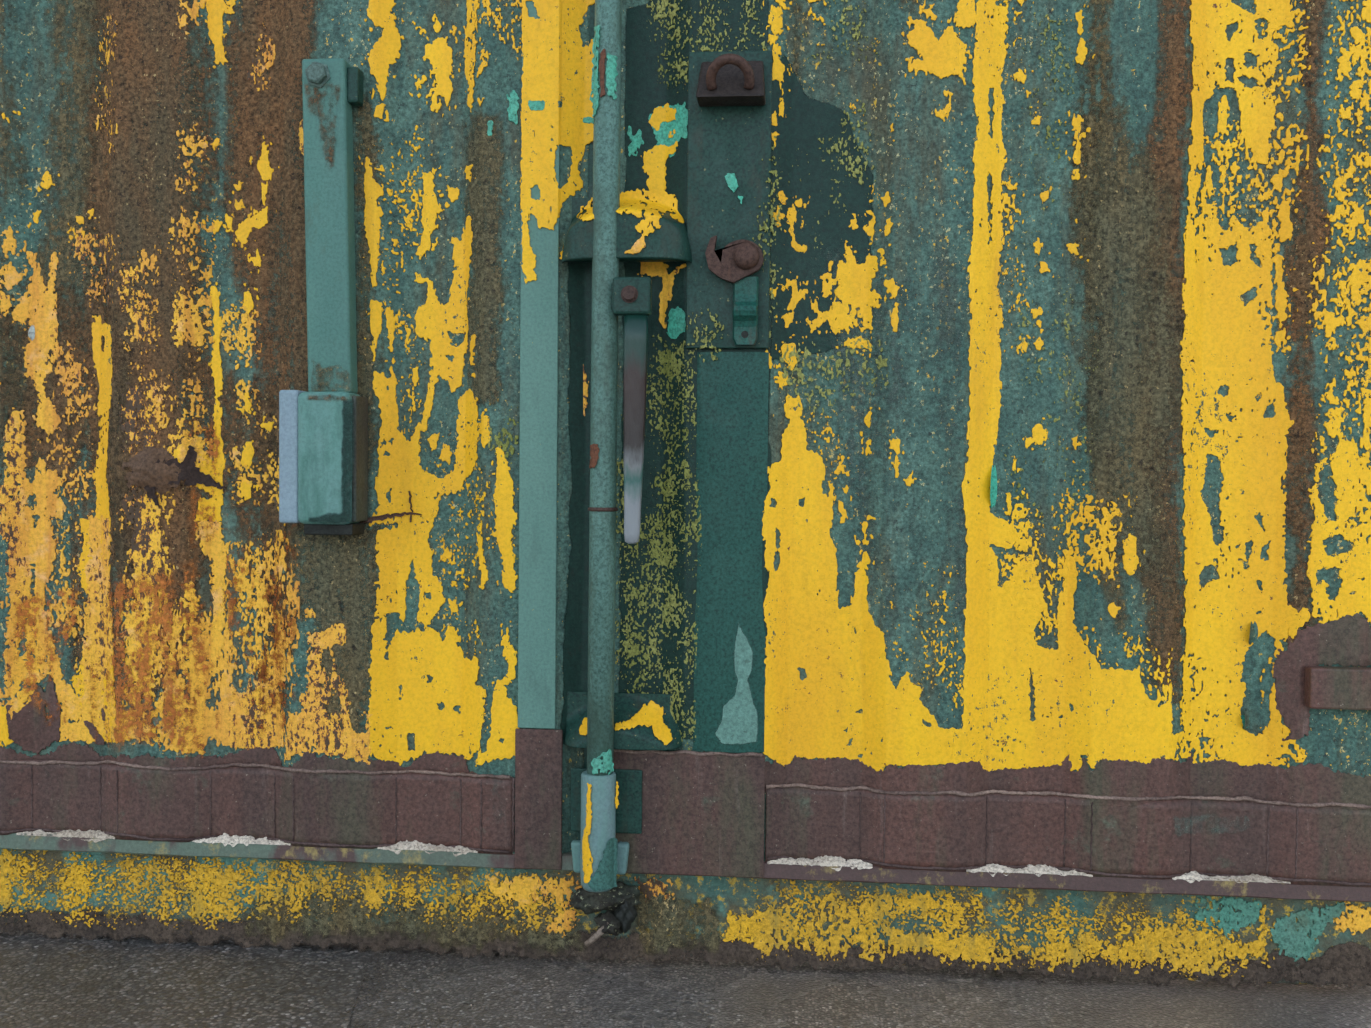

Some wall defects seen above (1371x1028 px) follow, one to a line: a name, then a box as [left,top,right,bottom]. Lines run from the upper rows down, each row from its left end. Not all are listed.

rust [0,0,384,757]
peeling [0,0,618,767]
rust [464,112,508,405]
peeling [615,0,1371,772]
rust [1069,0,1196,703]
rust [1273,0,1371,741]
peeling [0,749,619,938]
peeling [634,874,674,903]
peeling [722,880,1371,981]